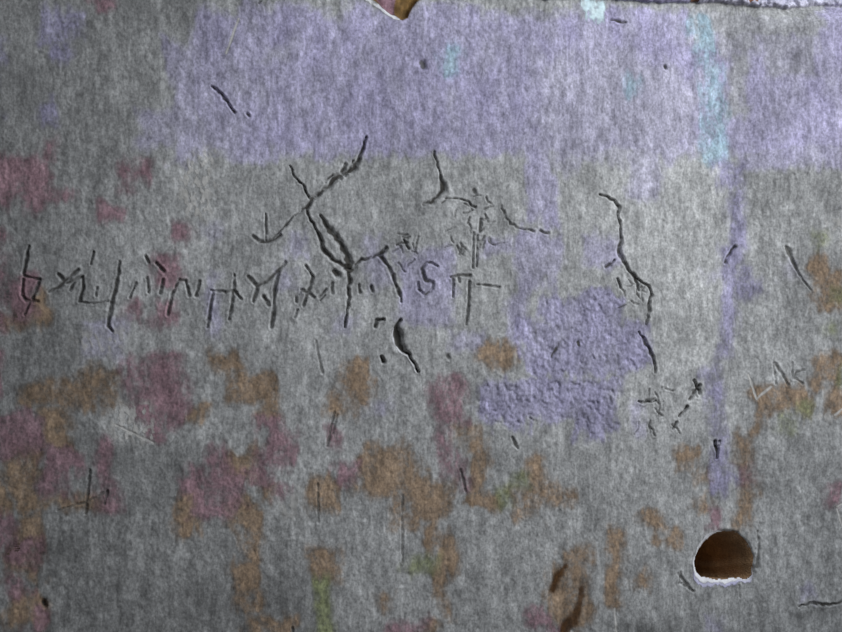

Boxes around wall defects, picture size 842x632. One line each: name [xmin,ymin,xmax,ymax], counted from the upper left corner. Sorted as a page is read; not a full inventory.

spalling [366,0,419,20]
crack [426,153,548,245]
crack [278,141,418,372]
crack [599,194,699,434]
rust [547,548,594,632]
hole [693,530,753,587]